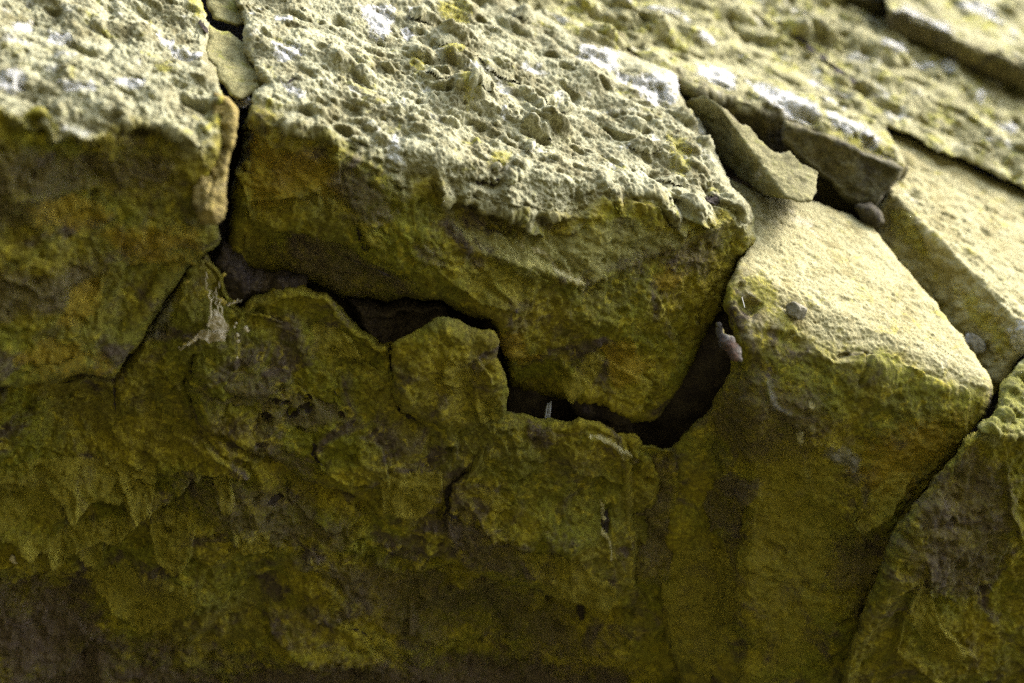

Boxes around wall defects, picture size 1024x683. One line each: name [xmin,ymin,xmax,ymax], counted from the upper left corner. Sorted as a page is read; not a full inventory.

crack [198,20,209,36]
crack [473,178,500,187]
crack [389,346,416,421]